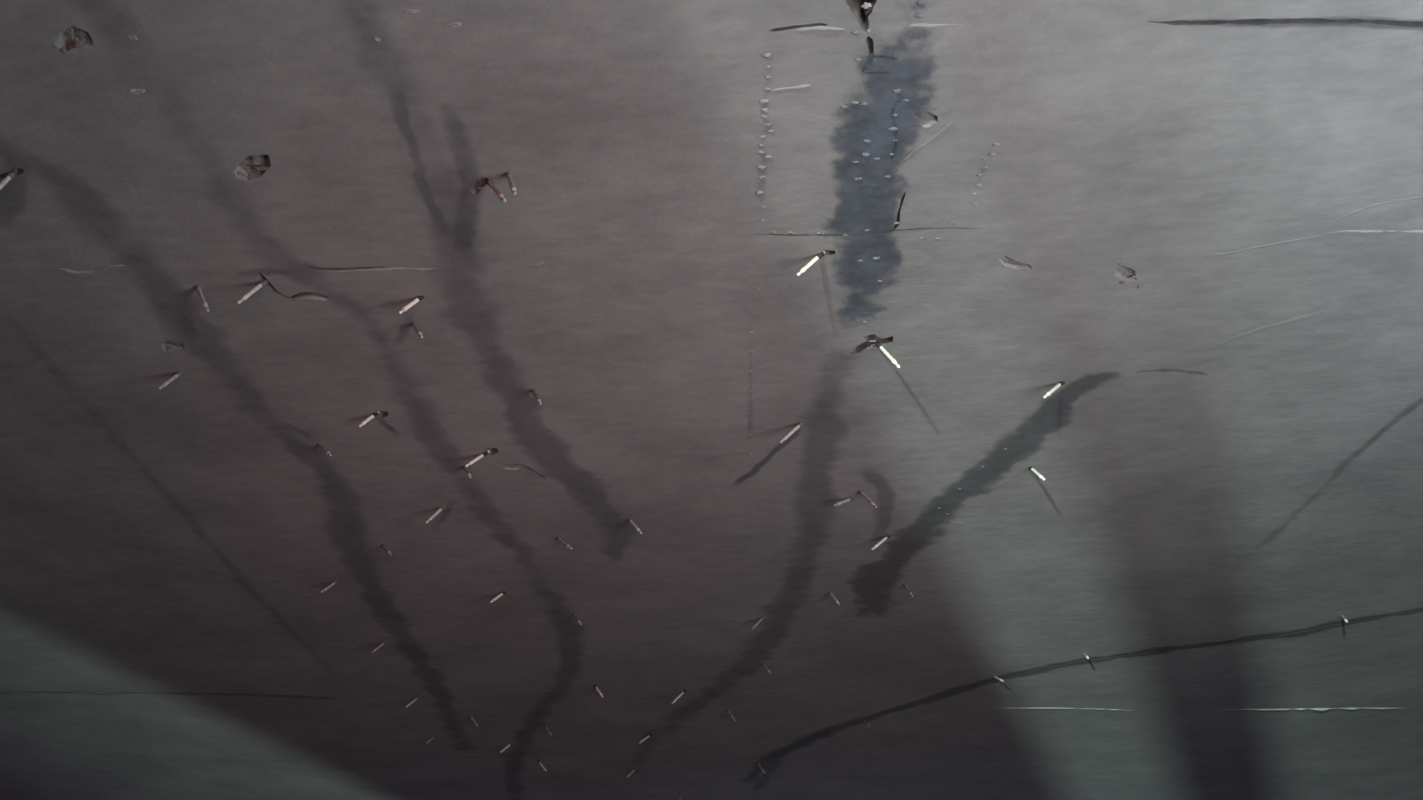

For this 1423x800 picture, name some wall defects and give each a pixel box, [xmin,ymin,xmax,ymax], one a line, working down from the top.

crack [1148,18,1423,27]
crack [959,609,1423,690]